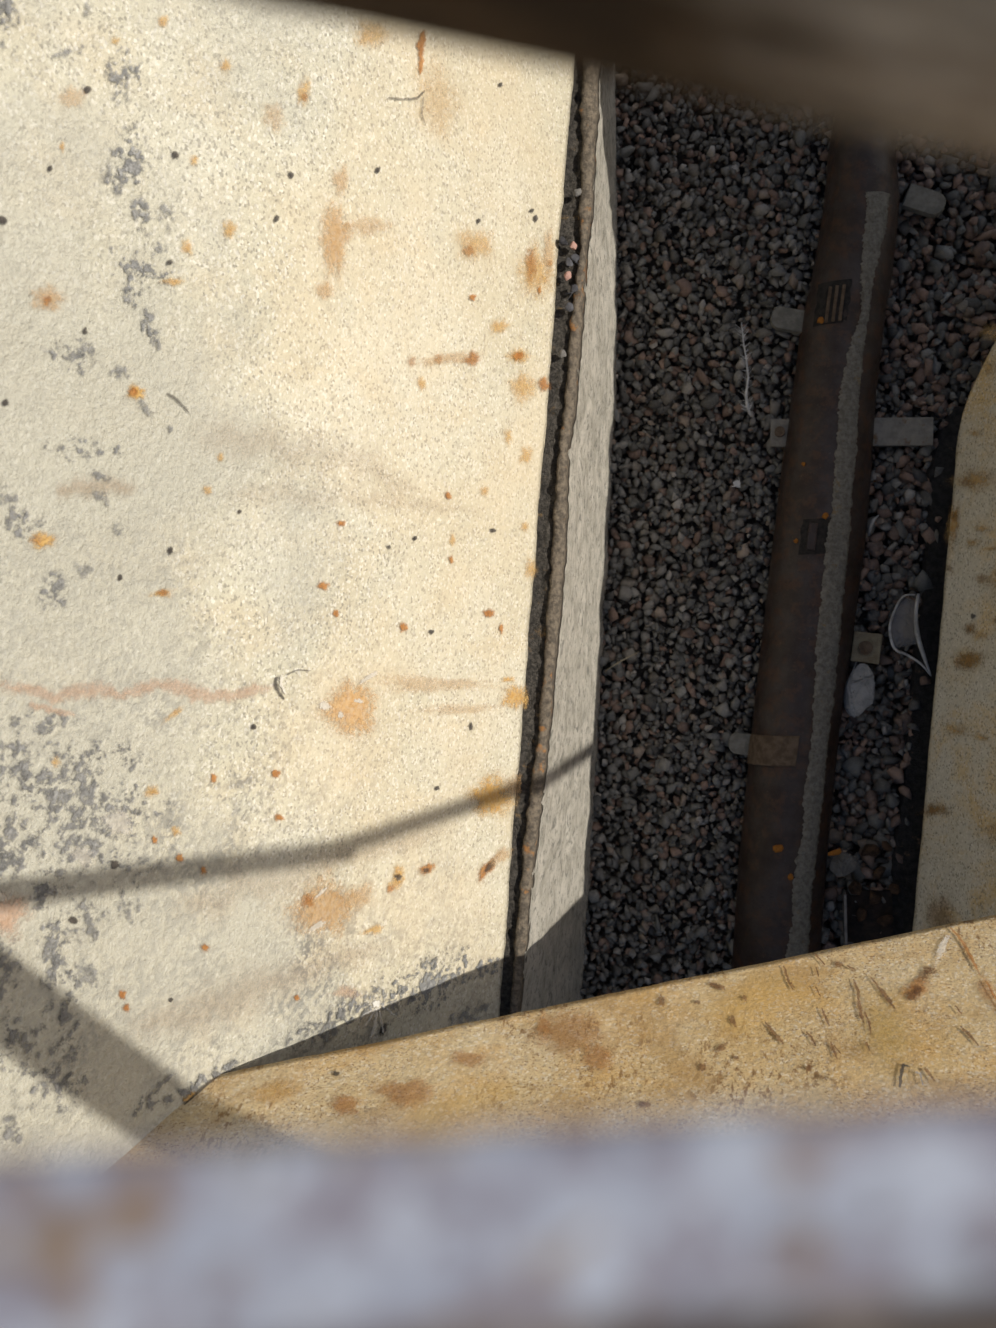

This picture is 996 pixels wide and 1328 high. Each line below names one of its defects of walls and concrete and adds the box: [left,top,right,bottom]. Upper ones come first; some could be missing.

rust [321,202,348,272]
rust [320,672,377,734]
rust [470,775,514,817]
rust [293,883,353,932]